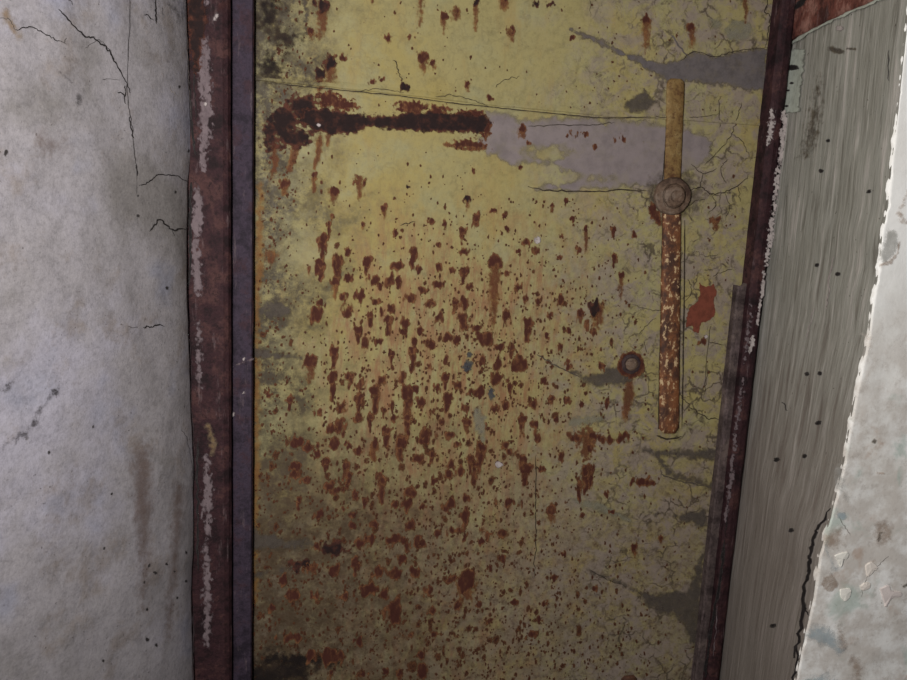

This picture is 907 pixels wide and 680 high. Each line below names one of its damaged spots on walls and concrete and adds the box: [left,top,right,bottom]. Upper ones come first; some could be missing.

corrosion [187,0,208,74]
corrosion [275,0,338,40]
corrosion [407,34,444,74]
corrosion [640,13,652,49]
crack [188,50,197,155]
crack [4,0,193,288]
peeling [477,111,666,194]
peeling [681,130,712,174]
peeling [743,108,788,364]
peeling [880,231,899,265]
peeling [686,283,717,338]
corrosion [252,44,678,680]